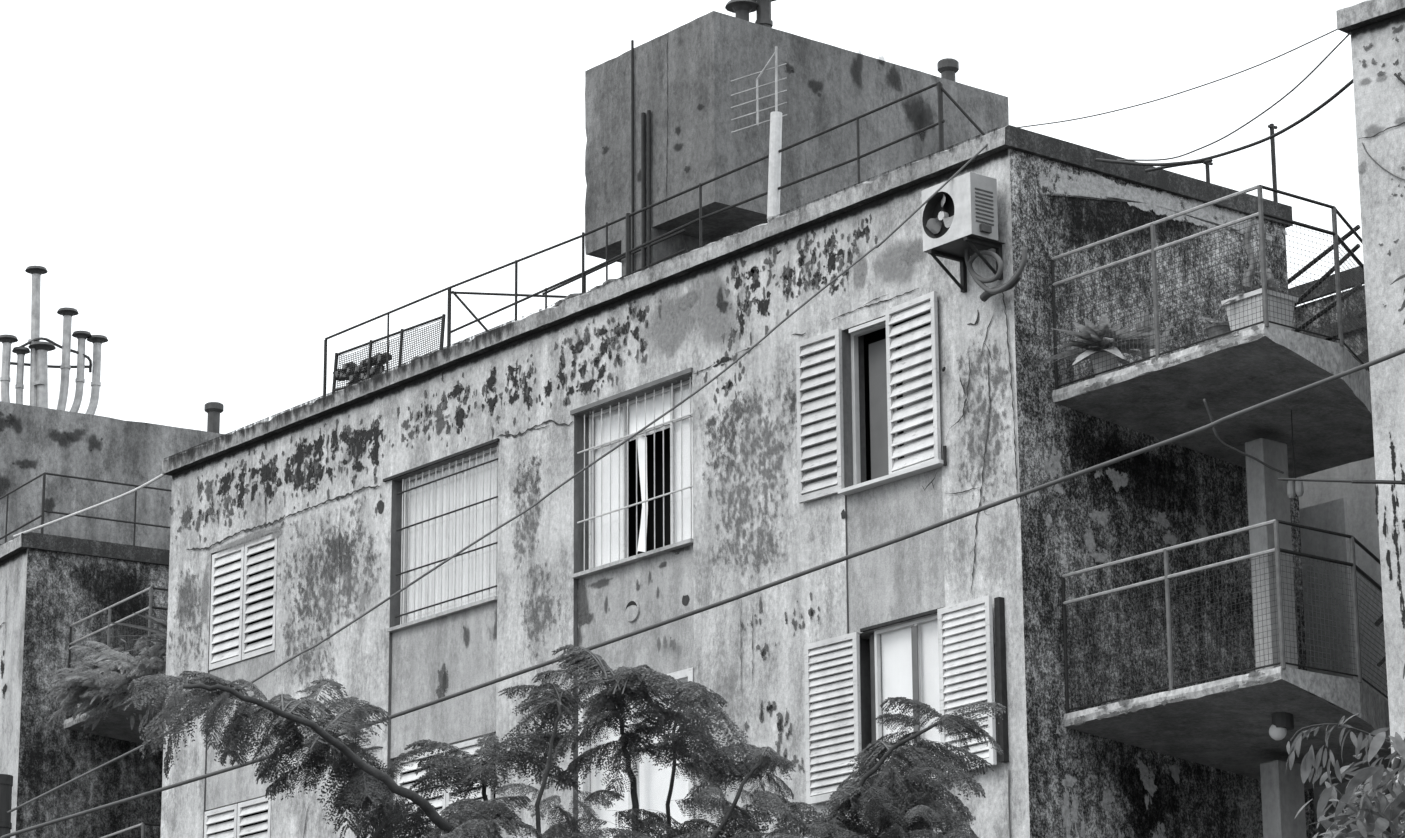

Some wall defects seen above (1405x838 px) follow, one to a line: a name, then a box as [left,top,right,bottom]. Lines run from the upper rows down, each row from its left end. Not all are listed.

peeling [1359,25,1403,80]
crack [1358,122,1405,139]
leakage [1045,181,1204,246]
peeling [697,213,878,403]
peeling [169,293,661,544]
leakage [700,357,798,577]
leakage [1063,419,1201,517]
leakage [511,456,610,657]
leakage [636,546,689,597]
leakage [1103,756,1182,838]